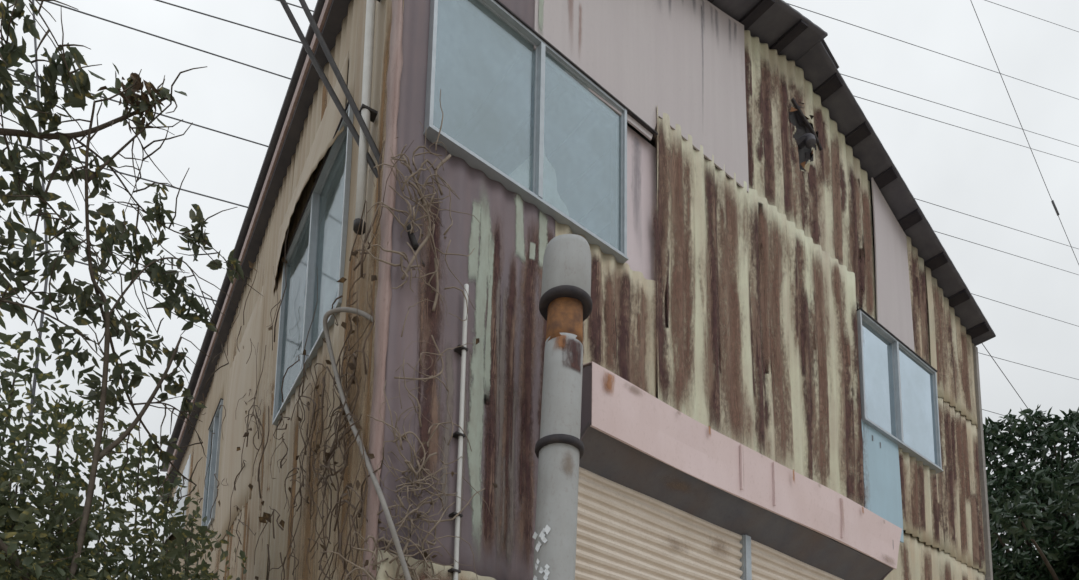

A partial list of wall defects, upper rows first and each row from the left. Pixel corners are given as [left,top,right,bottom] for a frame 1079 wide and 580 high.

corrosion [483,50,881,555]
corrosion [910,258,972,411]
corrosion [899,407,985,568]